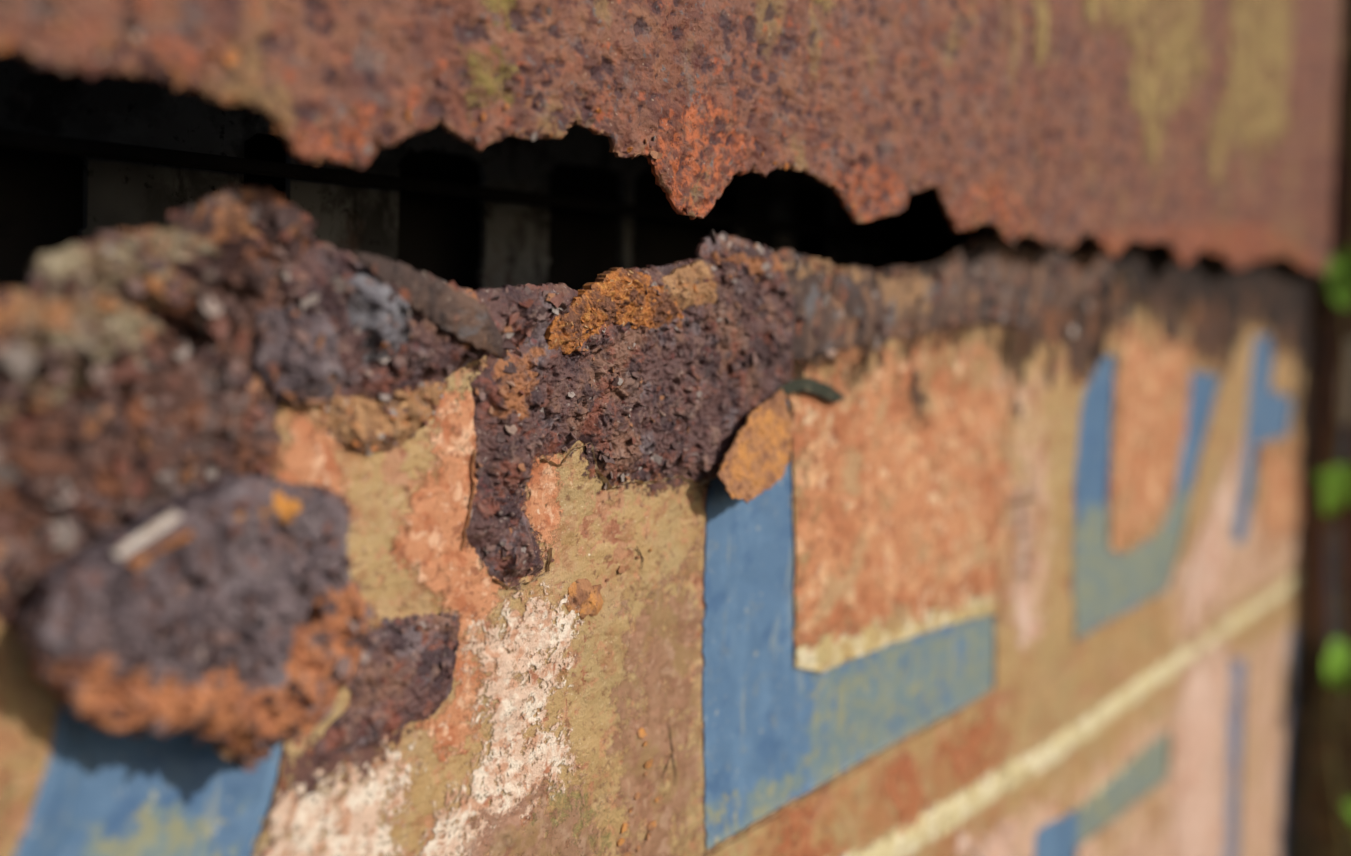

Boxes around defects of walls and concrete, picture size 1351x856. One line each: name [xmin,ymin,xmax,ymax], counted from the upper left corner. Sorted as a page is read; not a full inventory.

rust [0,186,1112,856]
water stain [786,254,1313,419]